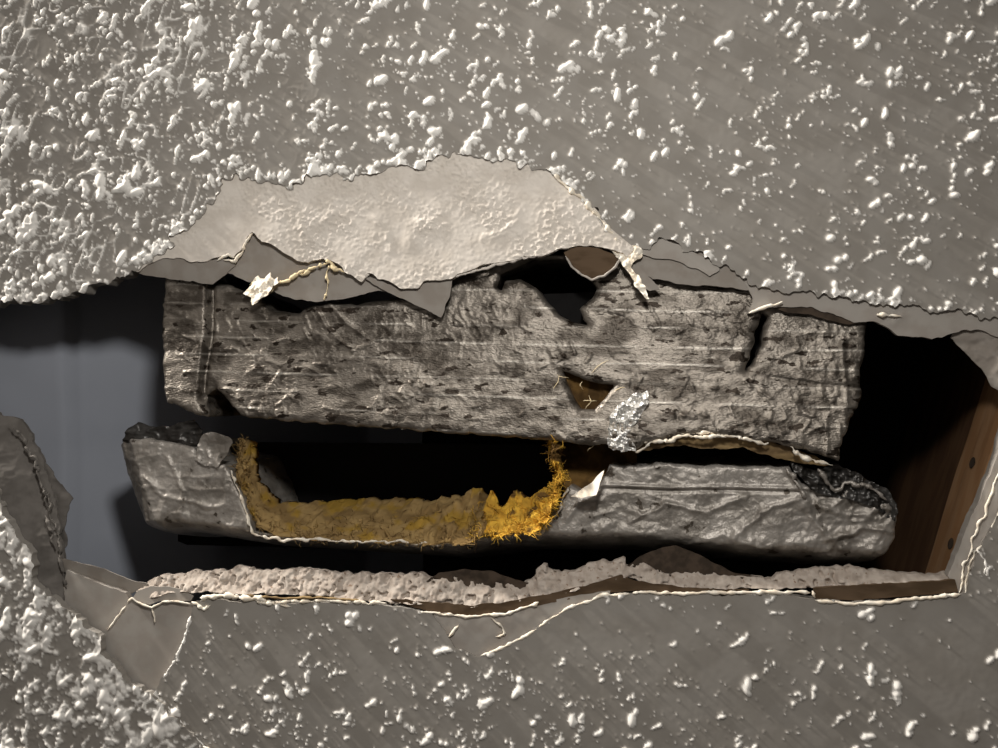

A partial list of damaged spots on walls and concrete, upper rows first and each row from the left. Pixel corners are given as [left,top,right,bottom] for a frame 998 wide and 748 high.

peeling [136,152,998,390]
spalling [61,429,998,691]